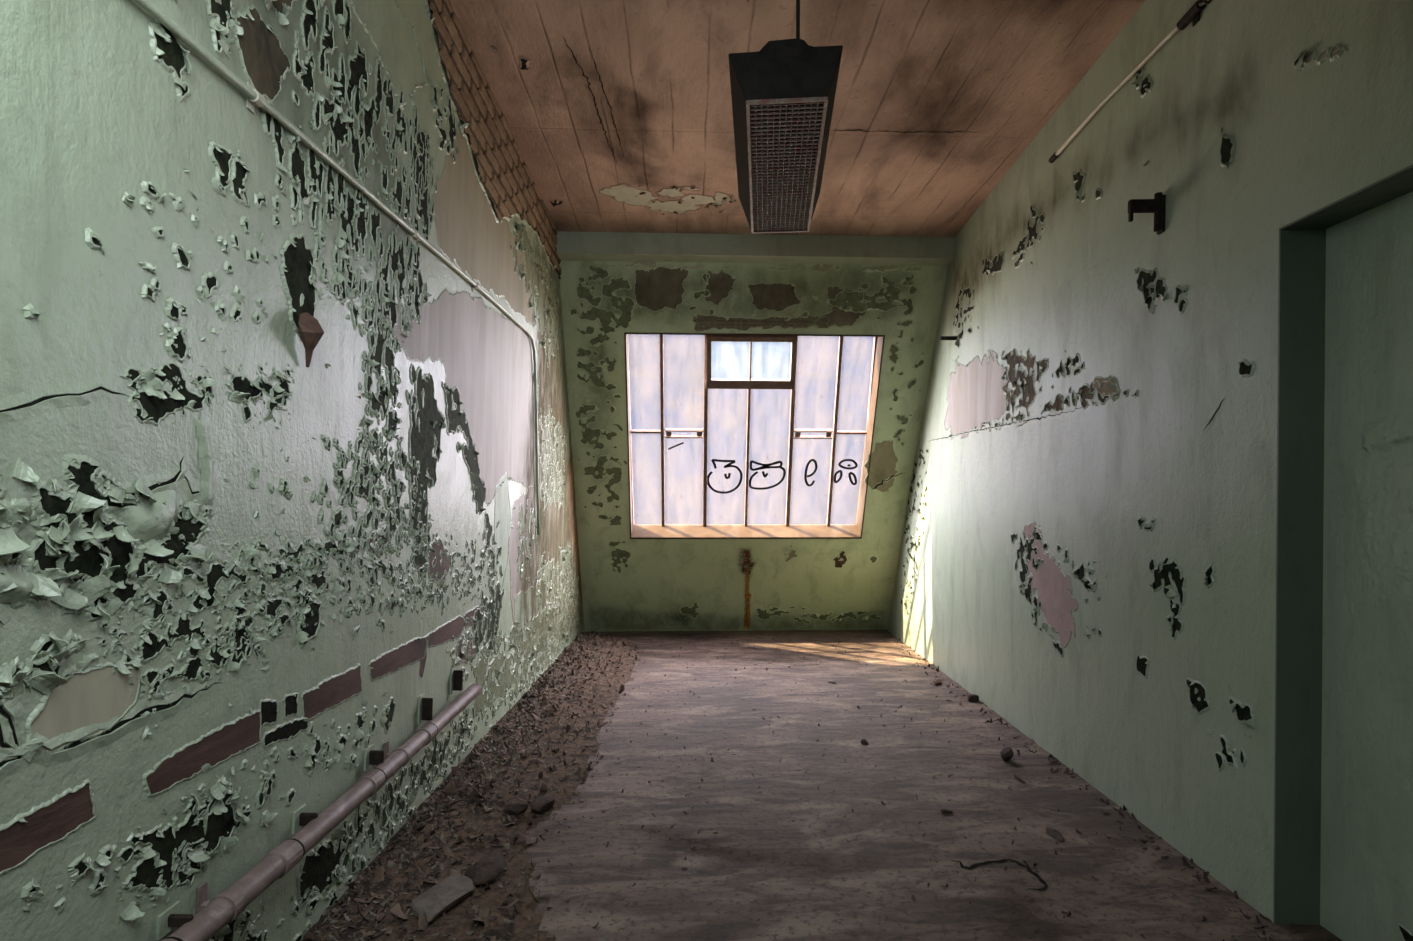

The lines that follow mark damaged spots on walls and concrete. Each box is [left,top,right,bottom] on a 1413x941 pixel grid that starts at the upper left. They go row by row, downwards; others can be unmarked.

flaking render [944,205,1138,440]
peeling [1135,267,1189,315]
crack [0,376,133,425]
flaking render [0,0,929,941]
crack [0,603,13,628]
corrosion [741,549,754,628]
flaking render [1011,522,1107,658]
peeling [1148,555,1186,640]
peeling [1204,563,1216,589]
peeling [1136,654,1150,679]
peeling [1185,677,1256,772]